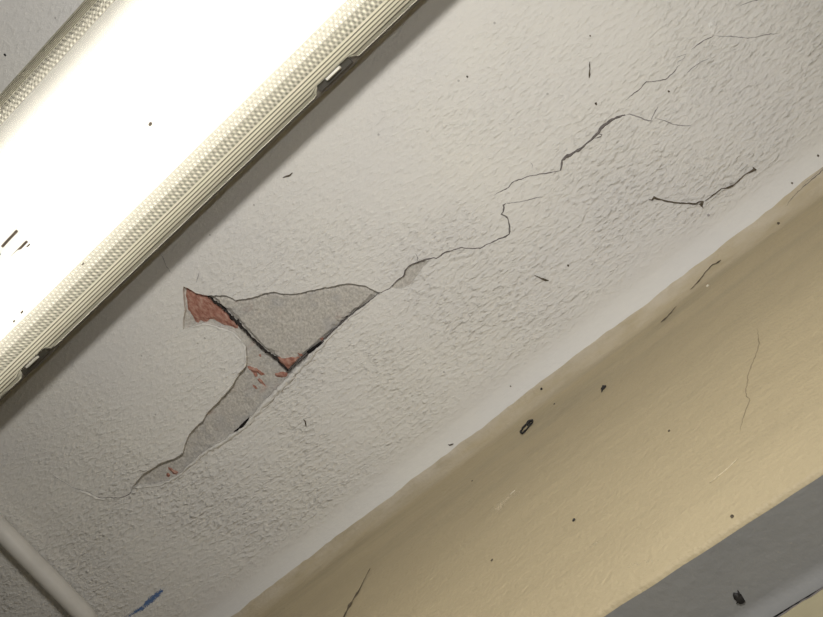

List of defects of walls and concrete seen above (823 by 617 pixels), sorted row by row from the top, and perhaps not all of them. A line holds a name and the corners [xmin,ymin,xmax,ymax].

crack [378,22,777,294]
flaking render [135,283,381,489]